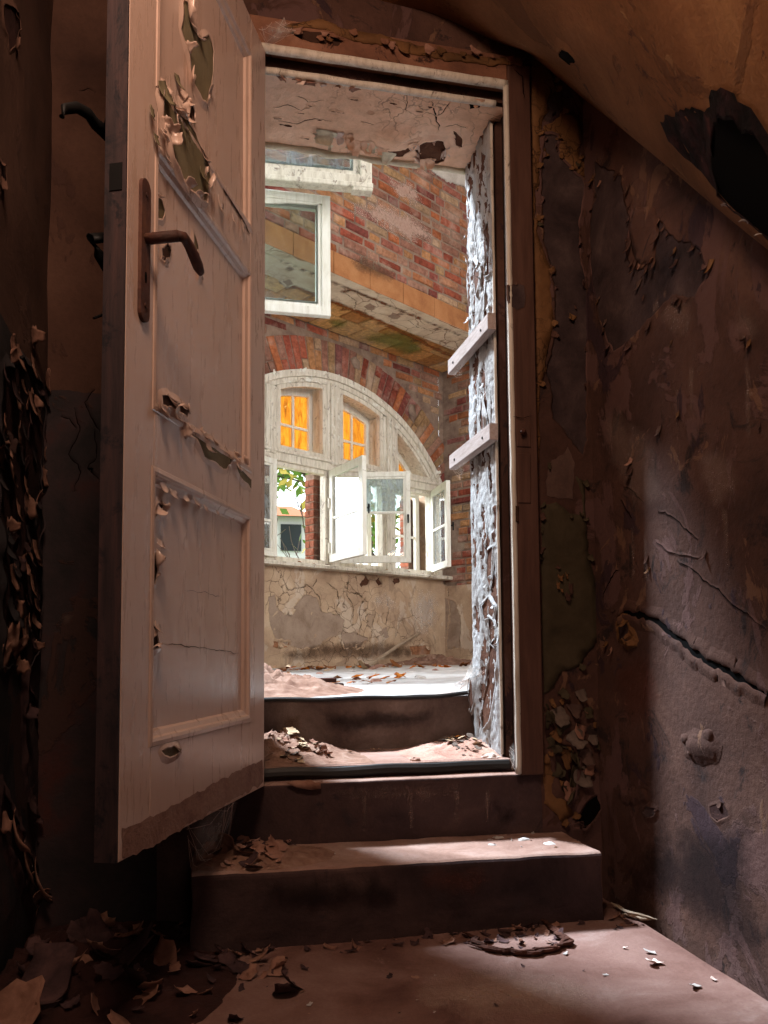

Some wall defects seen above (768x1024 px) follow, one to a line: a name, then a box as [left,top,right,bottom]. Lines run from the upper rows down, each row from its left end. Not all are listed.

crack [403,95,468,131]
flaking render [660,87,768,240]
peeling [272,19,601,499]
peeling [622,183,668,302]
peeling [0,324,51,680]
crack [281,576,390,635]
flaking render [437,535,500,755]
crack [615,598,768,708]
peeling [543,687,602,842]
peeling [0,774,53,927]